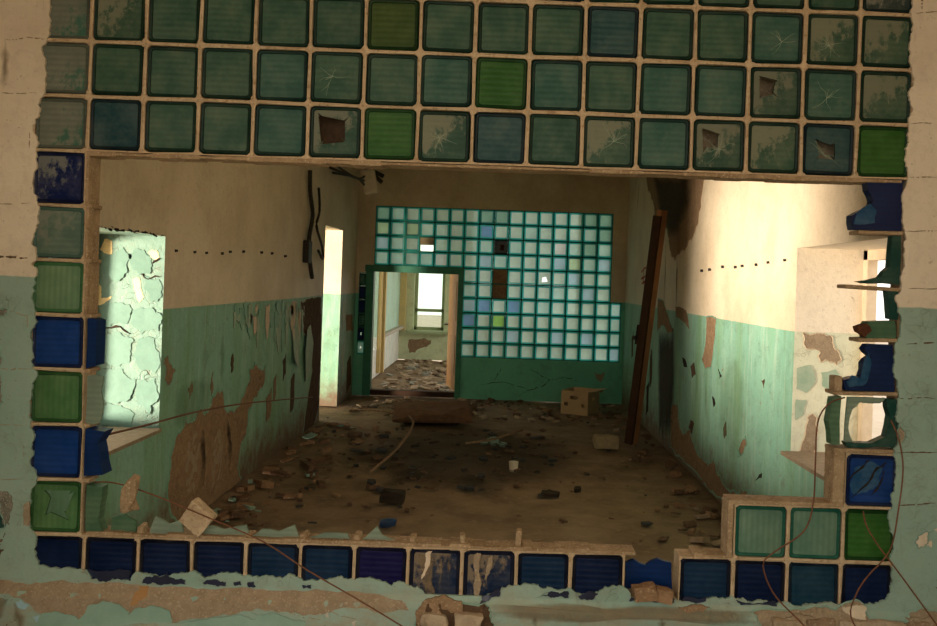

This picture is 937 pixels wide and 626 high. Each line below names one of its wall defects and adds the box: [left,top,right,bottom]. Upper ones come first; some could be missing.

spalling [166,295,322,522]
spalling [795,332,842,452]
peeling [0,491,30,530]
peeling [0,568,501,626]
peeling [544,591,598,600]
spalling [735,599,937,626]